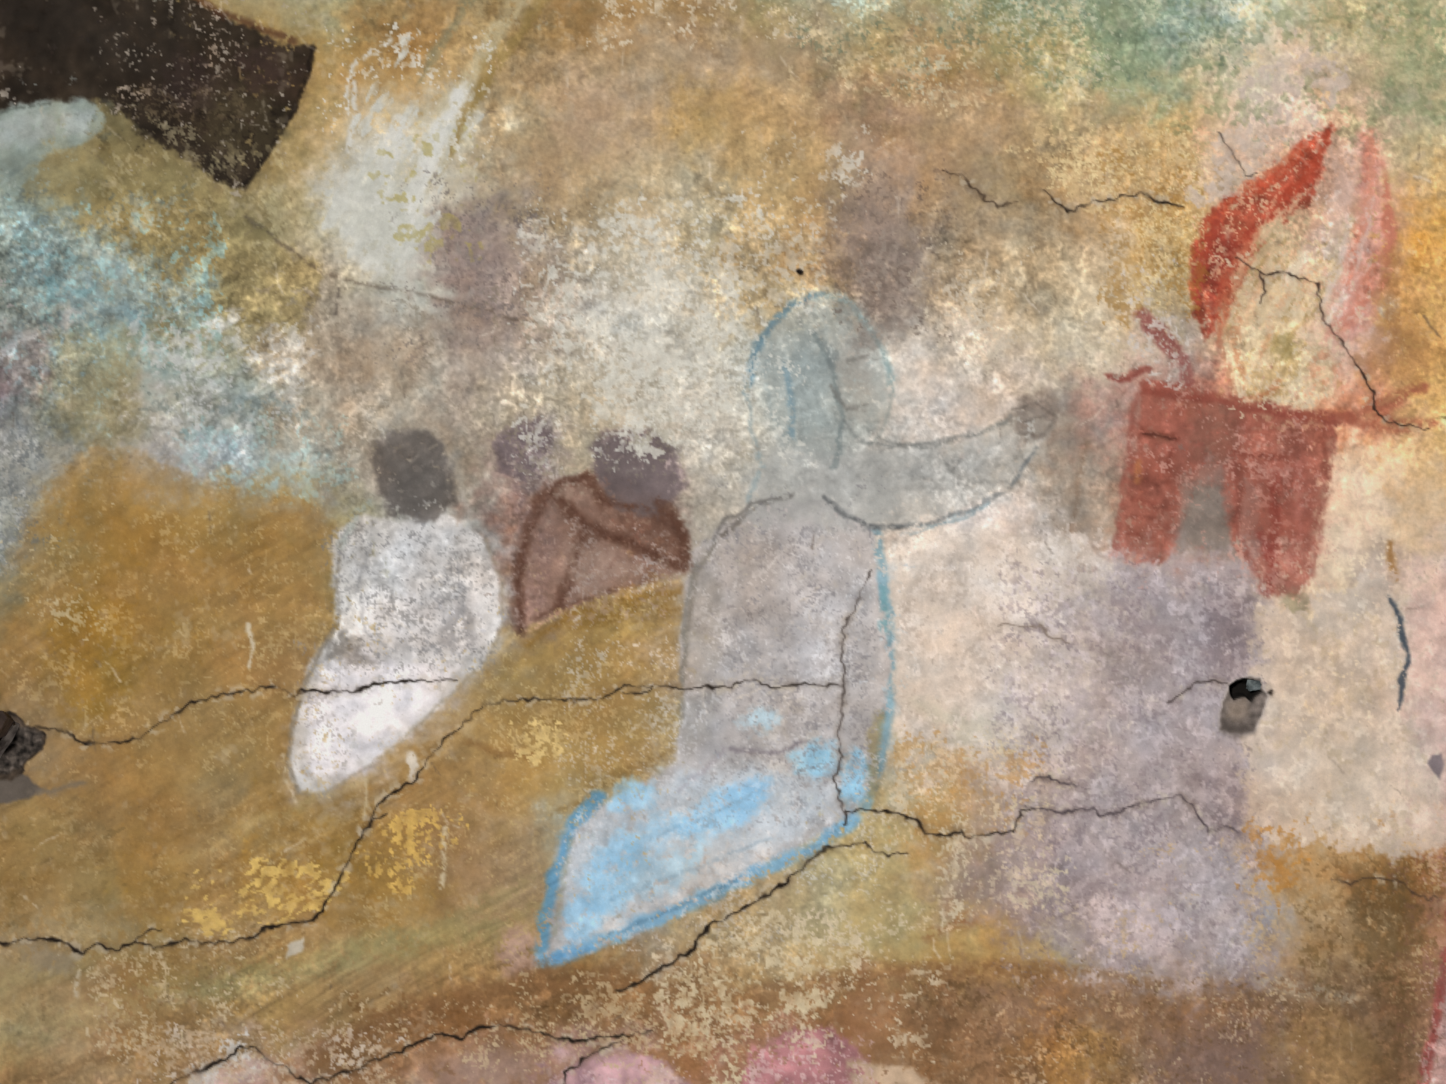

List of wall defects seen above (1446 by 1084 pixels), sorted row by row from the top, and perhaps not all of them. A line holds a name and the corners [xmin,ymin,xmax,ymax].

crack [1217,131,1260,179]
crack [941,169,1187,215]
crack [1236,255,1446,433]
spalling [1229,678,1263,702]
crack [1266,688,1277,696]
crack [0,570,1241,994]
crack [172,1025,654,1084]